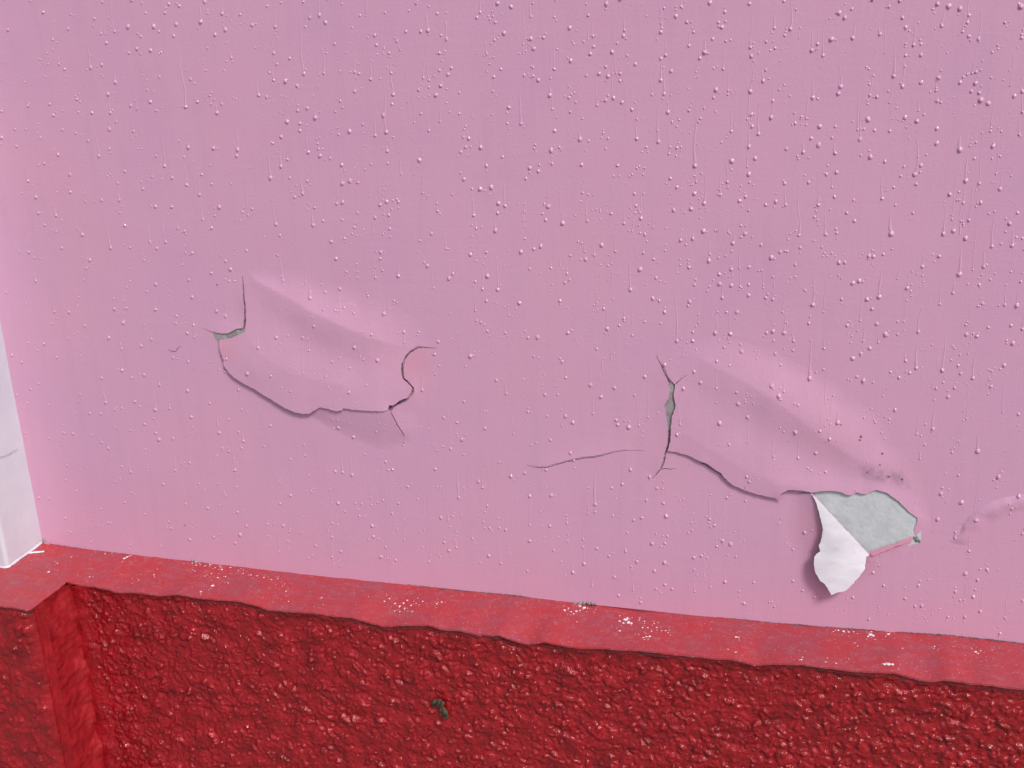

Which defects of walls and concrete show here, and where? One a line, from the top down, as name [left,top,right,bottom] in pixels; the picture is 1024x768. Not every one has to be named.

crack [637,355,687,478]
peeling [660,336,932,595]